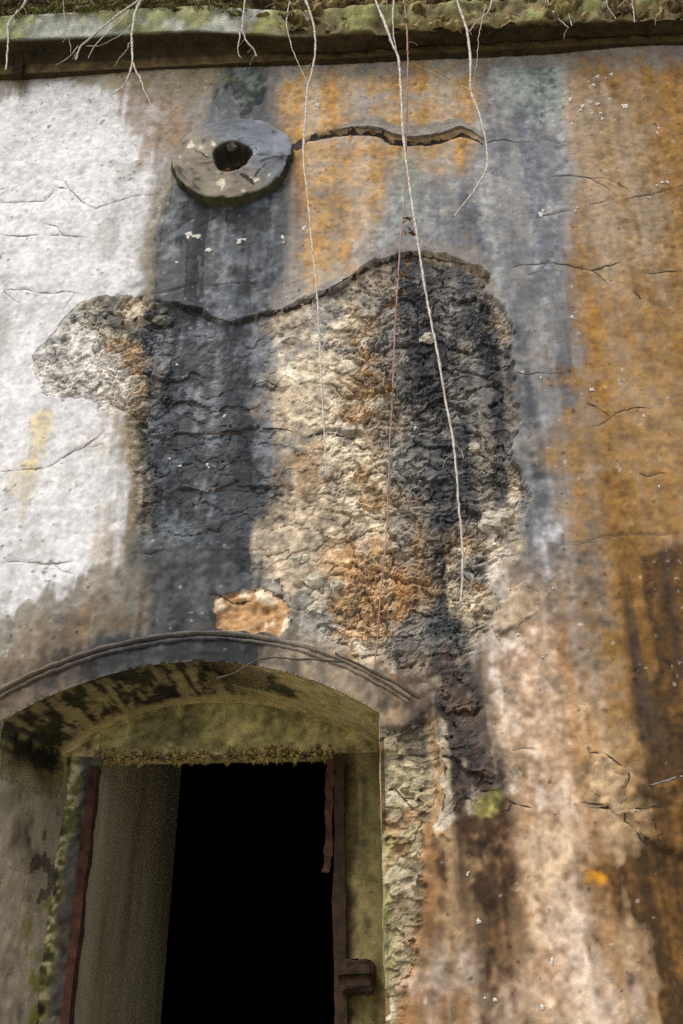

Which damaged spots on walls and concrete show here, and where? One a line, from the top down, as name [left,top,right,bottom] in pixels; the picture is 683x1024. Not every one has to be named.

crack [1,179,162,238]
corrosion [283,58,488,302]
crack [240,128,570,184]
corrosion [562,45,683,255]
spalling [33,296,208,410]
spalling [419,332,434,344]
crack [0,438,100,471]
damp [0,66,407,801]
spalling [135,285,415,663]
spalling [477,489,520,537]
corrosion [386,181,683,1024]
crack [586,752,683,844]